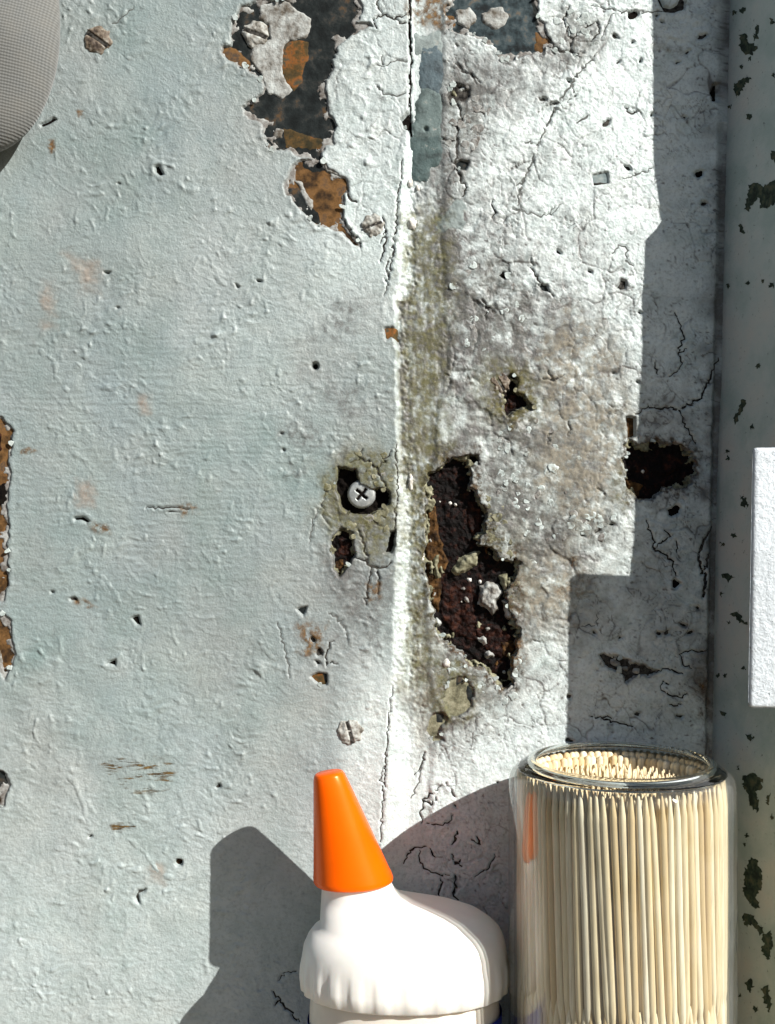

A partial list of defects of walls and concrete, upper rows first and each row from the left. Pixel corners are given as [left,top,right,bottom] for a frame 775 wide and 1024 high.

peeling [222,0,371,247]
crack [344,0,413,295]
peeling [402,0,599,182]
peeling [744,180,775,212]
corrosion [497,372,532,430]
corrosion [616,433,699,506]
crack [635,357,719,444]
peeling [0,417,16,678]
corrosion [422,454,525,691]
crack [646,520,712,598]
crack [403,752,496,900]
peeling [742,857,773,960]